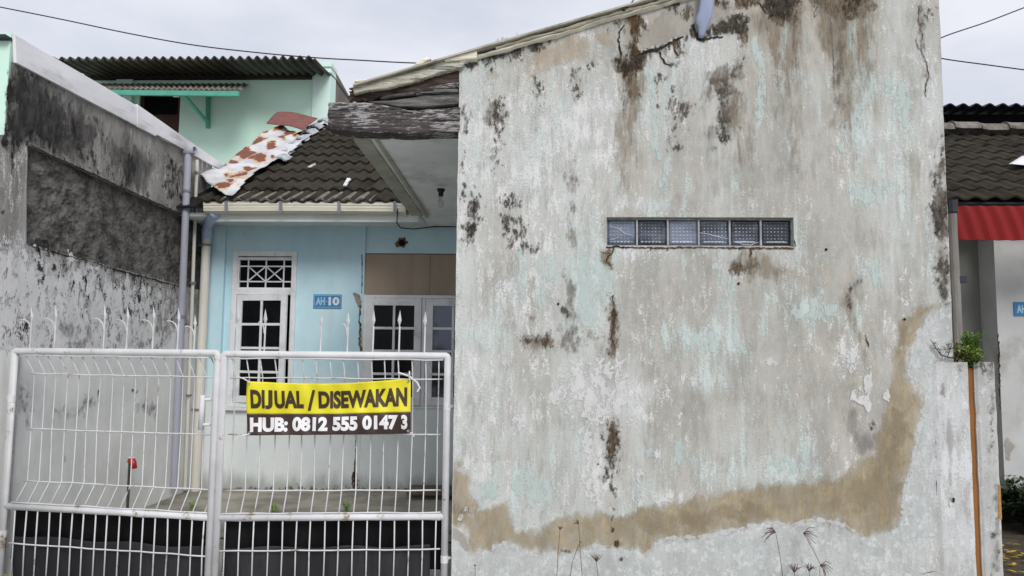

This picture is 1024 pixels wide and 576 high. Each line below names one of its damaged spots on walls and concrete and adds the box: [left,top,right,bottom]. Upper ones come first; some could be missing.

crack [617,25,688,67]
crack [916,6,935,96]
mould [1,71,184,200]
mould [485,95,508,174]
water stain [706,56,752,159]
water stain [452,131,952,576]
peeling [841,350,890,413]